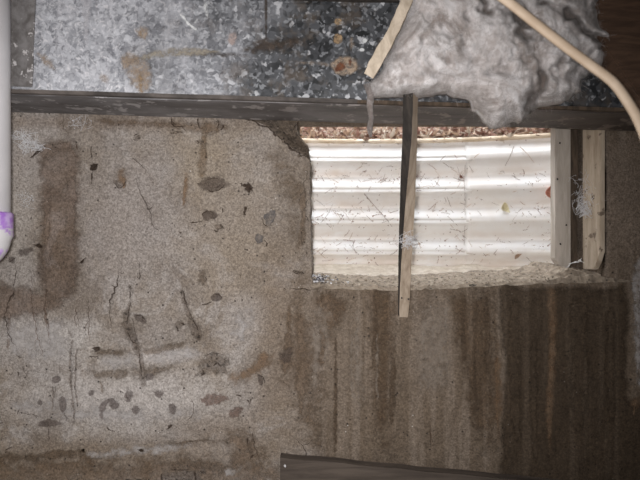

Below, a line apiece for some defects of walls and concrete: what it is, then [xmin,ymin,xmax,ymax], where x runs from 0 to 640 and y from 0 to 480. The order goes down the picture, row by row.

corrosion [122,48,217,92]
corrosion [332,57,357,74]
spalling [245,119,309,158]
crack [3,266,50,376]
leakage [0,140,144,422]
crack [109,263,141,321]
leakage [282,294,346,444]
leakage [369,290,396,430]
leakage [454,260,640,480]